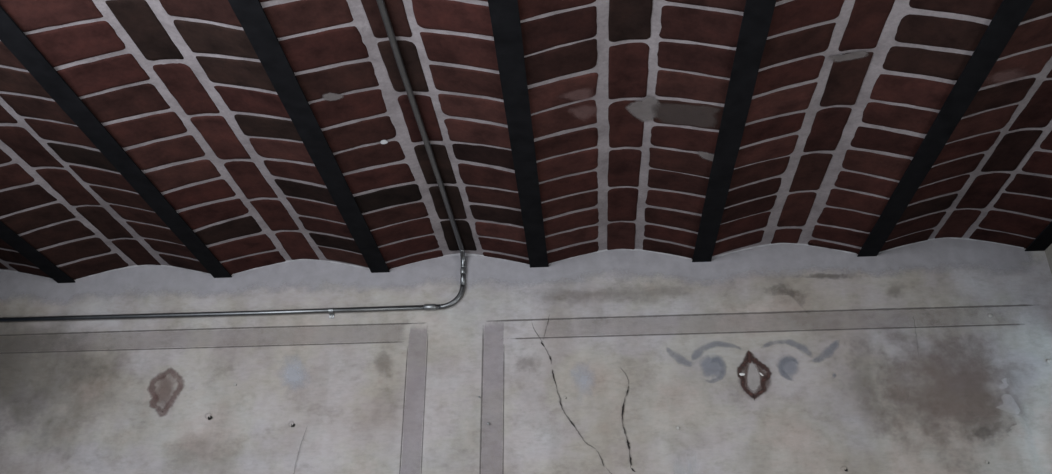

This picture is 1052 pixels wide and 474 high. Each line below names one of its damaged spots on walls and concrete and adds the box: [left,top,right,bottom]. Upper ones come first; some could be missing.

crack [532,315,635,474]